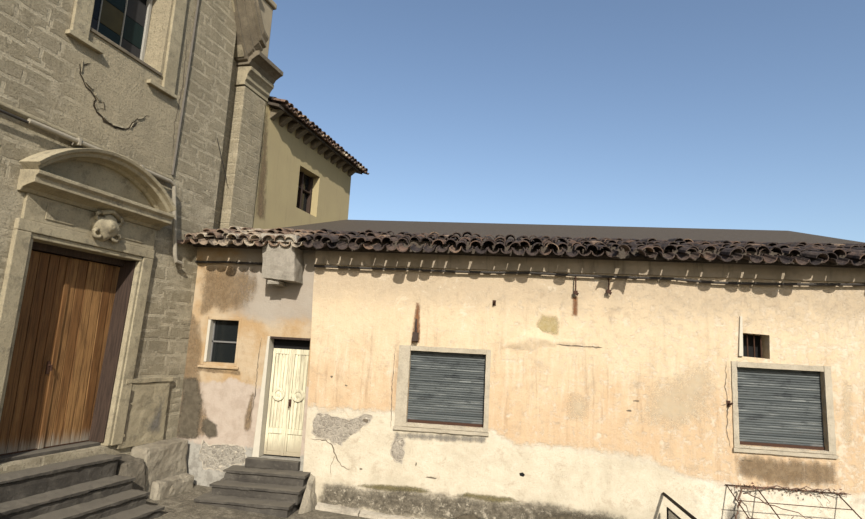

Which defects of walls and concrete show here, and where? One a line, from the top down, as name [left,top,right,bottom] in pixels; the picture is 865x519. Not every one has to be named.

crack [79,61,148,130]
corrosion [412,304,420,343]
spalling [311,412,374,446]
spalling [199,439,247,473]
crack [313,439,349,473]
spalling [390,436,406,464]
water stain [320,485,613,519]